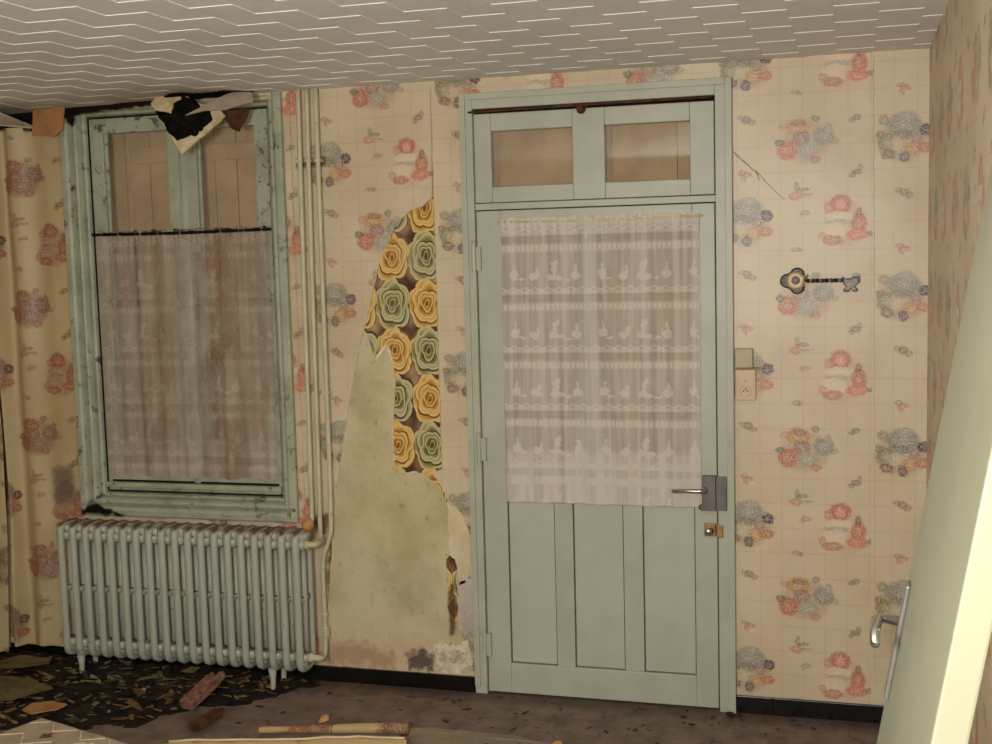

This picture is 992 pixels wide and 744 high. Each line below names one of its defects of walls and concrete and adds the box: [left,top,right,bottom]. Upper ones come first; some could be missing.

flaking render [324,328,474,676]